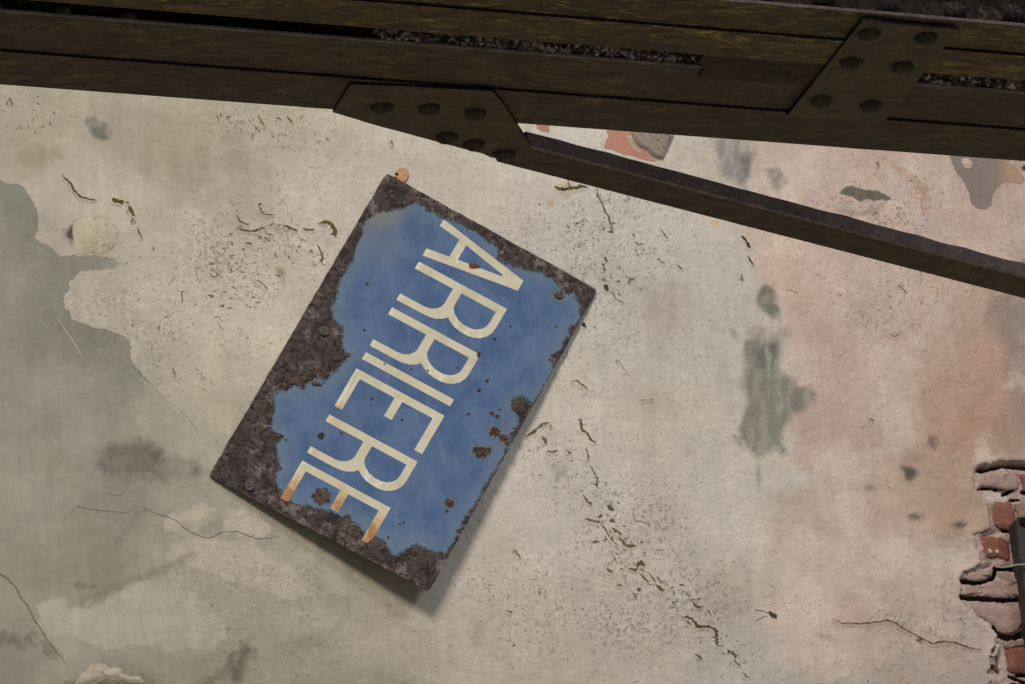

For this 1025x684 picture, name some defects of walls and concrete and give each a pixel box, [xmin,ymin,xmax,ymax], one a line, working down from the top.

leakage [84,113,113,142]
spalling [604,130,674,162]
spalling [950,156,1025,209]
peeling [0,84,313,431]
leakage [726,281,820,493]
leakage [91,434,208,489]
crack [69,490,280,539]
peeling [162,497,306,606]
flaking render [959,461,1025,684]
crack [0,573,67,665]
peeling [34,579,229,684]
crack [816,618,999,656]